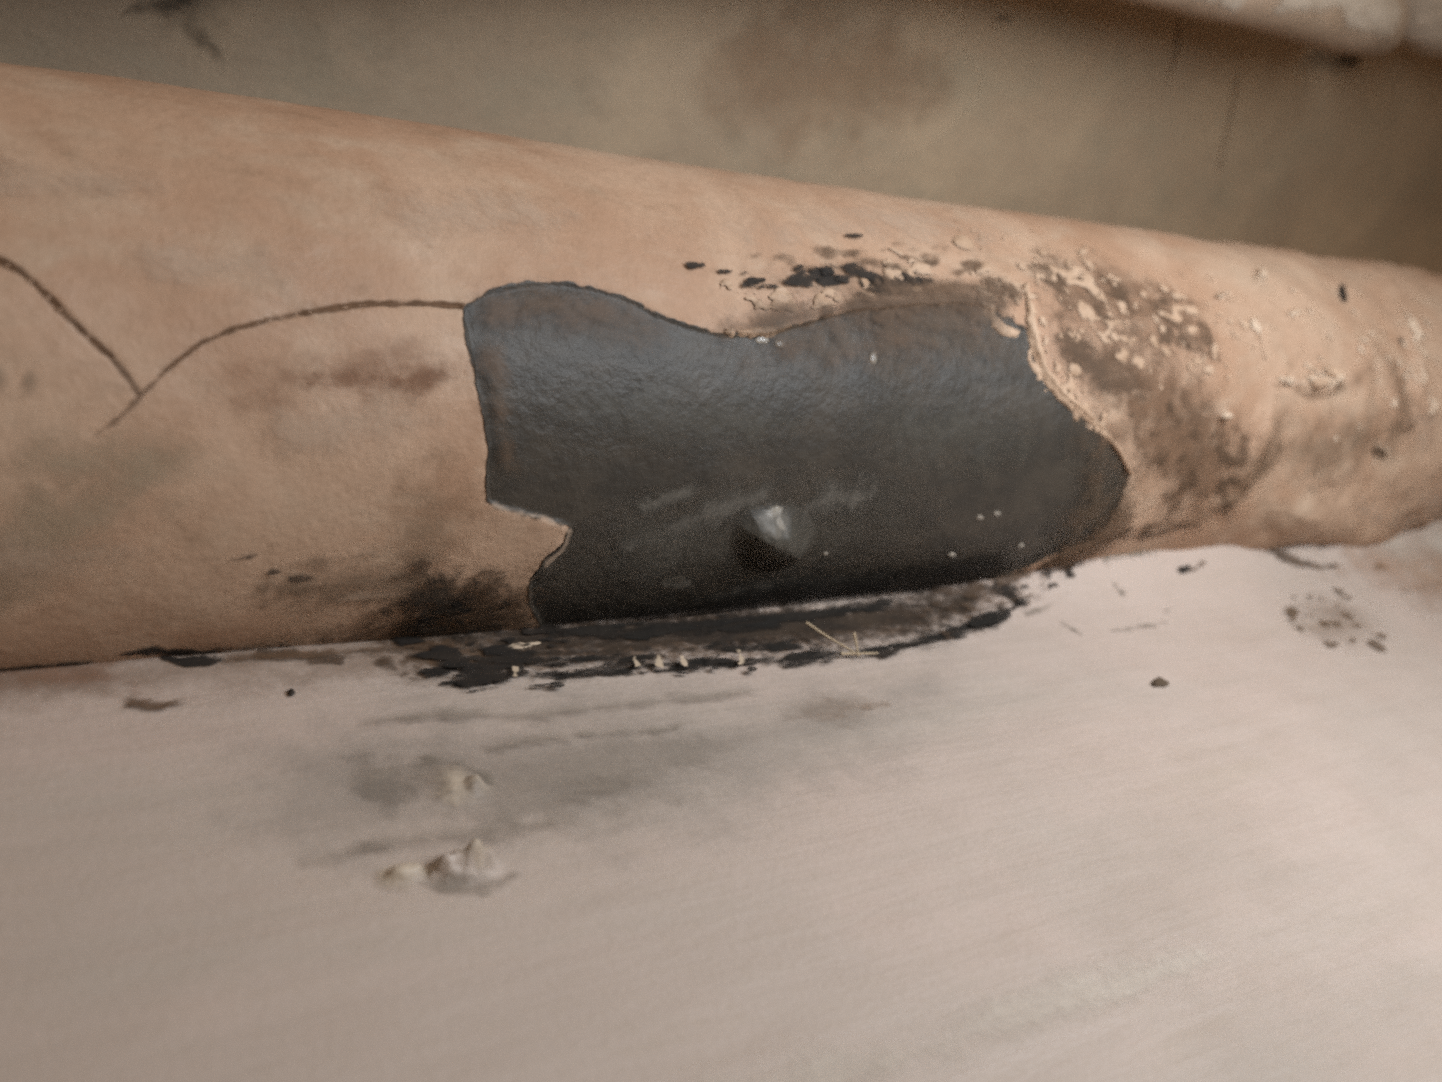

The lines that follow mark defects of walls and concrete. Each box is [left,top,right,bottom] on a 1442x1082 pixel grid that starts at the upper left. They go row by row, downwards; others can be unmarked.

crack [0,256,465,395]
peeling [1338,284,1348,302]
spalling [463,219,1267,627]
leakage [121,541,1100,692]
leakage [127,699,179,709]